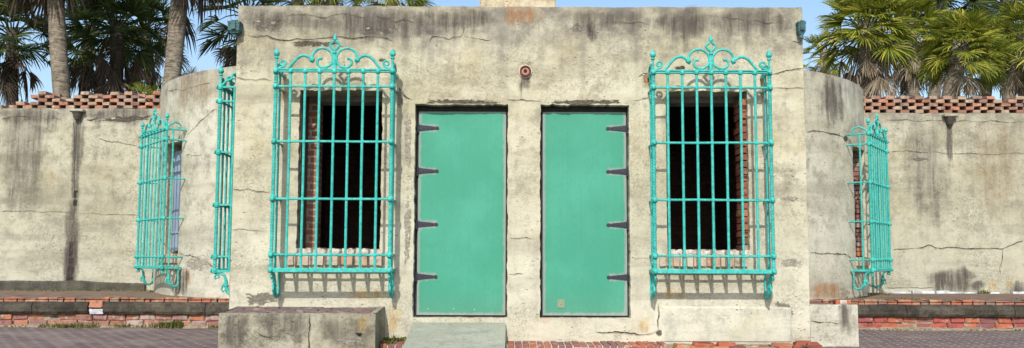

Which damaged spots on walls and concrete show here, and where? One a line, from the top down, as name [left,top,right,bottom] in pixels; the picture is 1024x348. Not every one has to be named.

crack [238,13,493,43]
damp [73,127,82,170]
crack [893,241,1024,274]
damp [935,267,982,292]